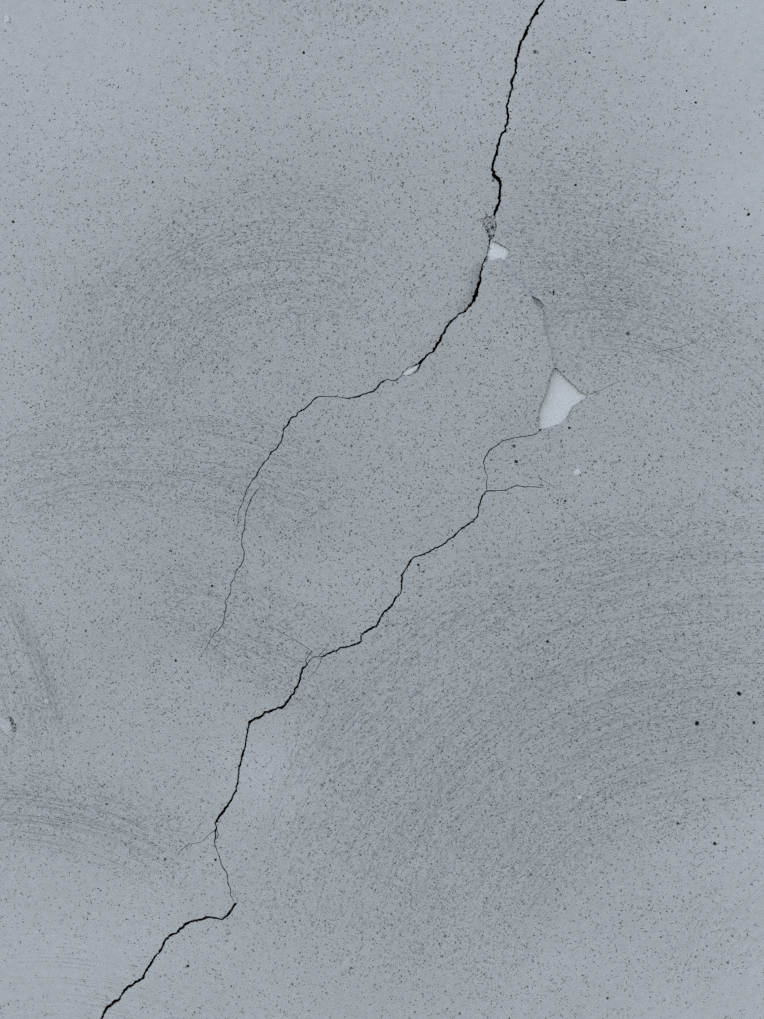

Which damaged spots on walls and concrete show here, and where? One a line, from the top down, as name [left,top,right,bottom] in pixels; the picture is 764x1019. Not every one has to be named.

crack [199,0,545,658]
peeling [403,215,587,486]
crack [100,430,554,1019]